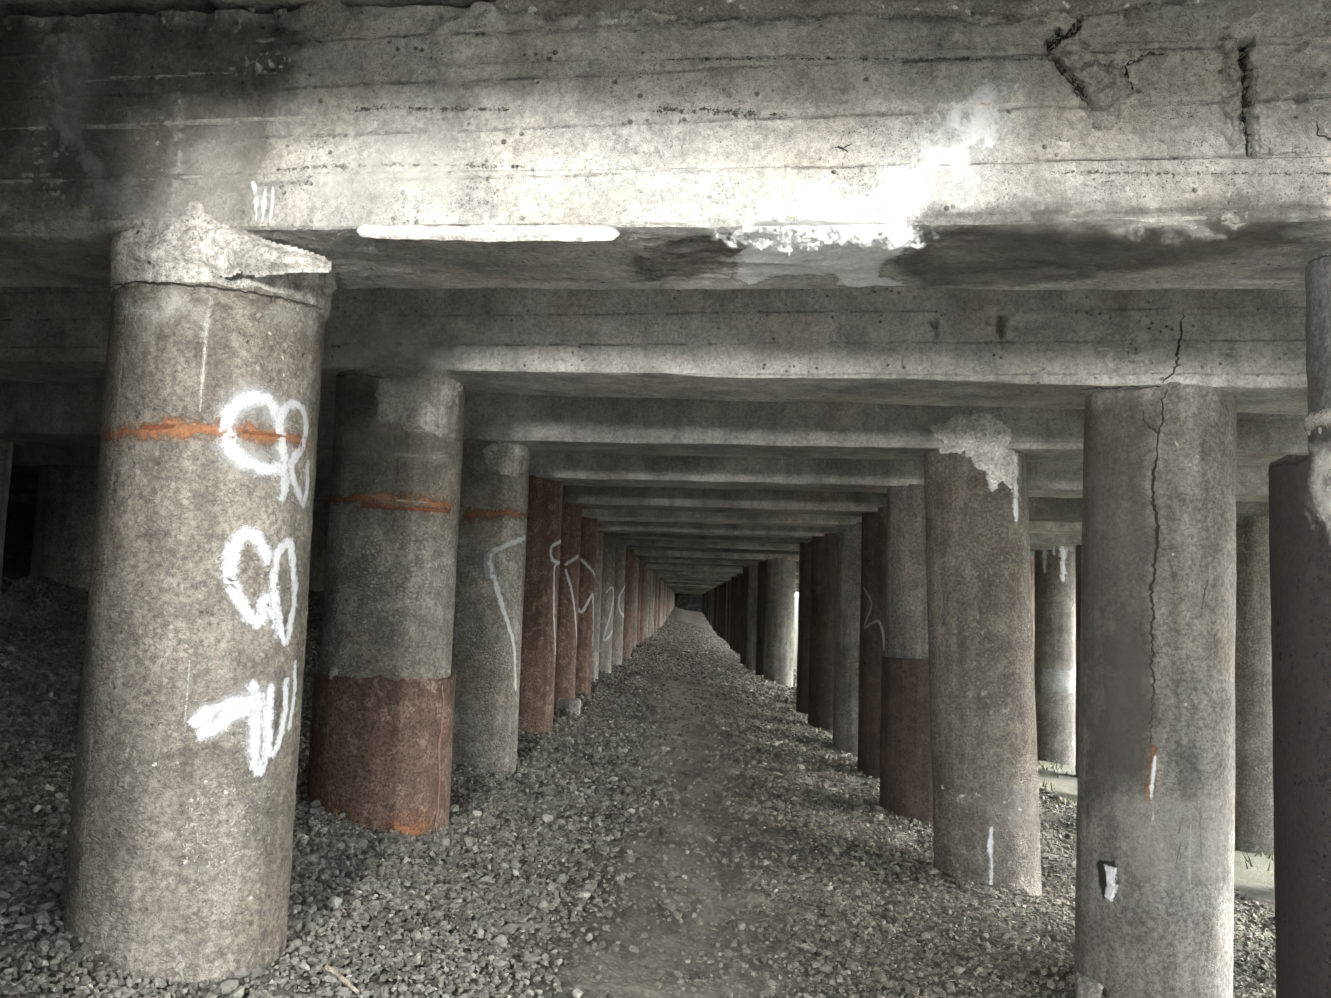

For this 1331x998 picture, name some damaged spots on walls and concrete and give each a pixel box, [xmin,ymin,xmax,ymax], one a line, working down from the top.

water stain [633,78,1300,288]
crack [1044,19,1165,131]
crack [1219,37,1261,158]
crack [1316,124,1331,141]
crack [1081,312,1205,390]